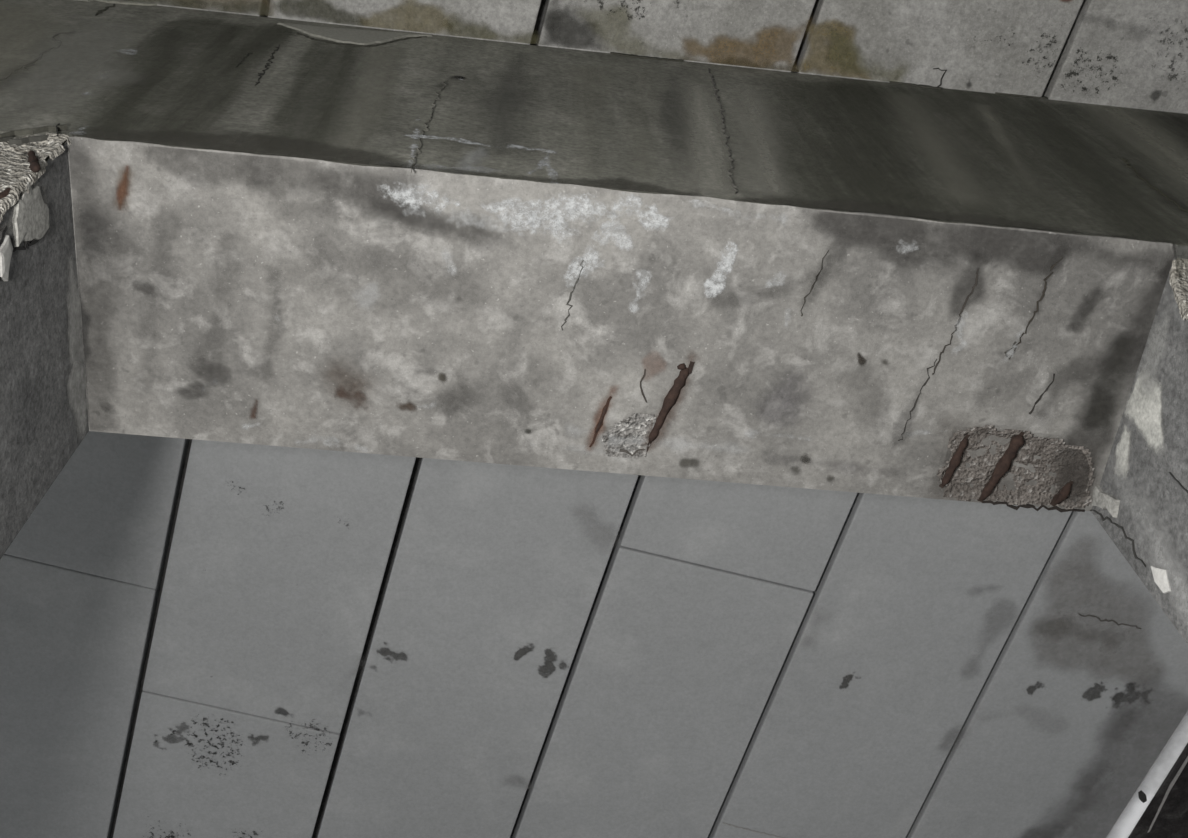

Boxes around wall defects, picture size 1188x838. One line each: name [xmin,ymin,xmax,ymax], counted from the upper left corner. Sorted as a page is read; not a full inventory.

spalling [0,123,71,281]
leakage [74,45,483,170]
leakage [446,85,724,248]
leakage [686,19,1188,312]
spalling [589,361,695,459]
crack [801,250,829,316]
crack [898,269,978,441]
crack [1004,255,1063,360]
crack [1029,374,1055,414]
leakage [1060,306,1152,500]
peeling [1115,323,1166,477]
spalling [937,425,1171,593]